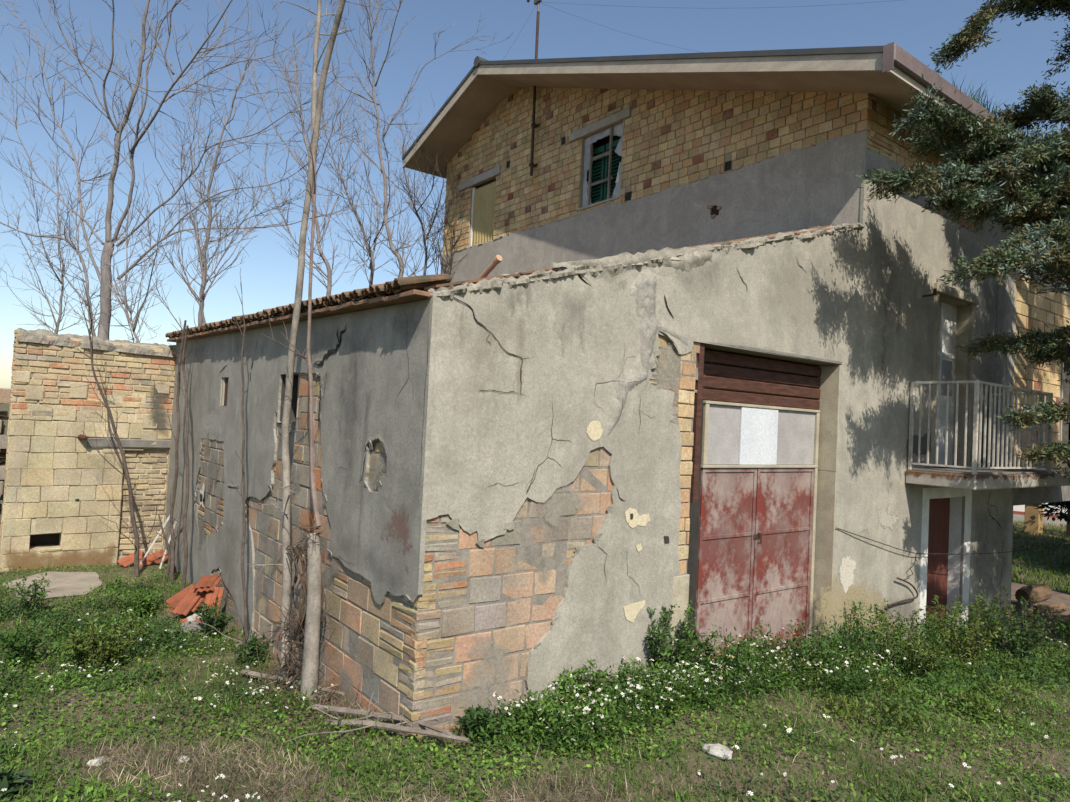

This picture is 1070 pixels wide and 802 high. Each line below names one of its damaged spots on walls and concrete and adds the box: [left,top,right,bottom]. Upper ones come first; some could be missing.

water stain [152,386,168,430]
flaking render [194,438,228,548]
crack [307,323,346,432]
crack [437,293,526,396]
crack [488,406,571,493]
crack [594,353,657,430]
flaking render [245,372,650,739]